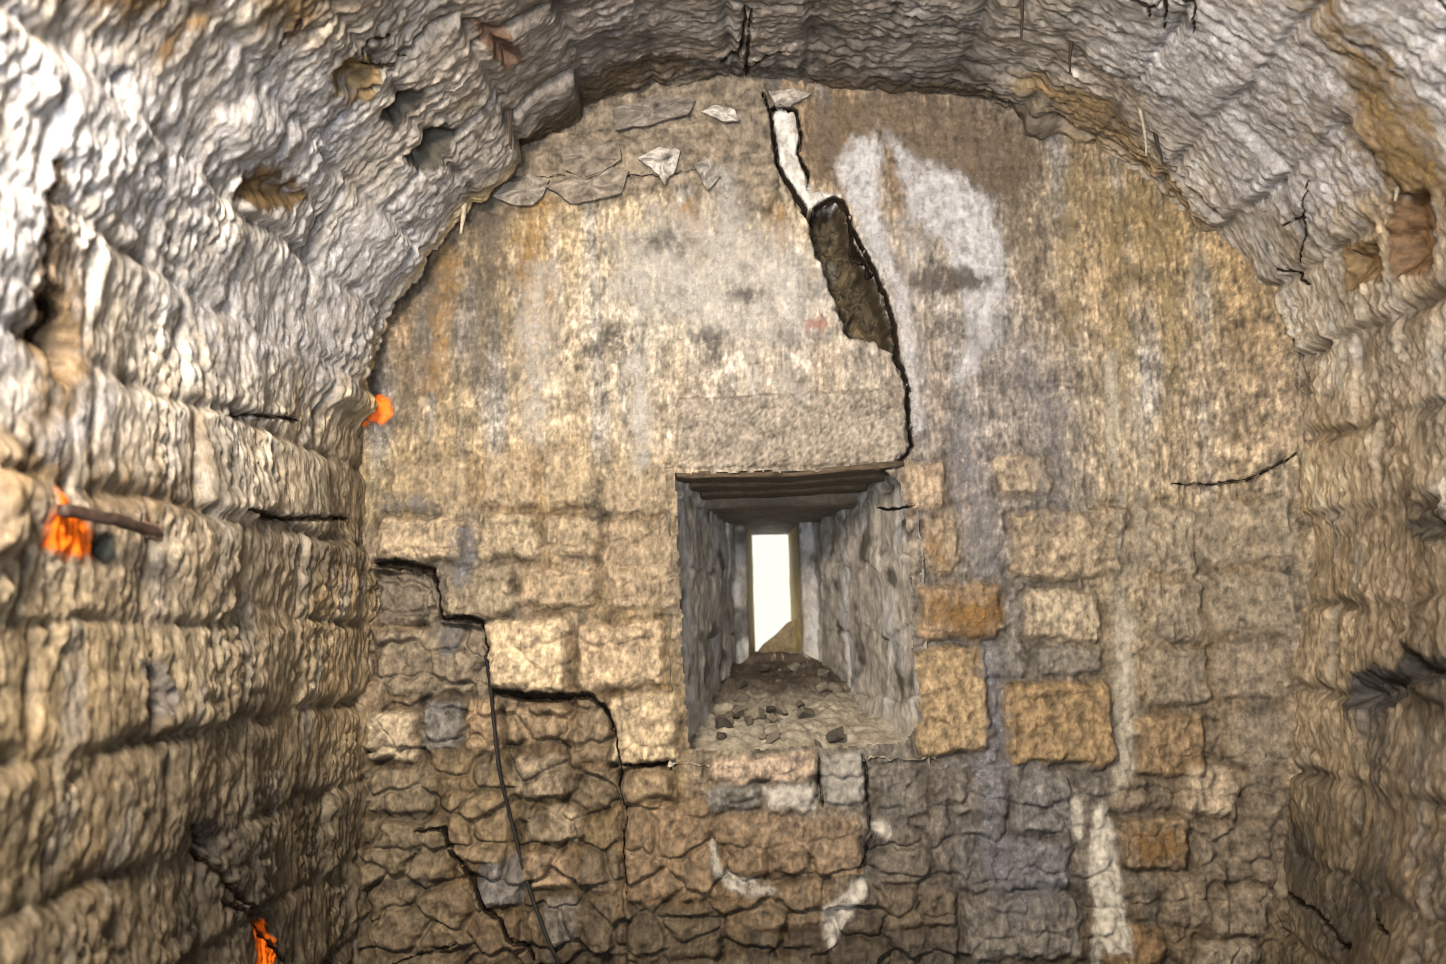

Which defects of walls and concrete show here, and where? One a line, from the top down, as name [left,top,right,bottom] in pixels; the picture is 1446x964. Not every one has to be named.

leakage [457,53,704,384]
peeling [493,97,739,242]
crack [719,6,914,472]
peeling [768,88,1004,431]
leakage [808,77,1057,287]
leakage [1105,354,1118,460]
crack [392,942,457,964]
crack [414,826,543,964]
crack [375,557,674,895]
leakage [1070,589,1134,964]